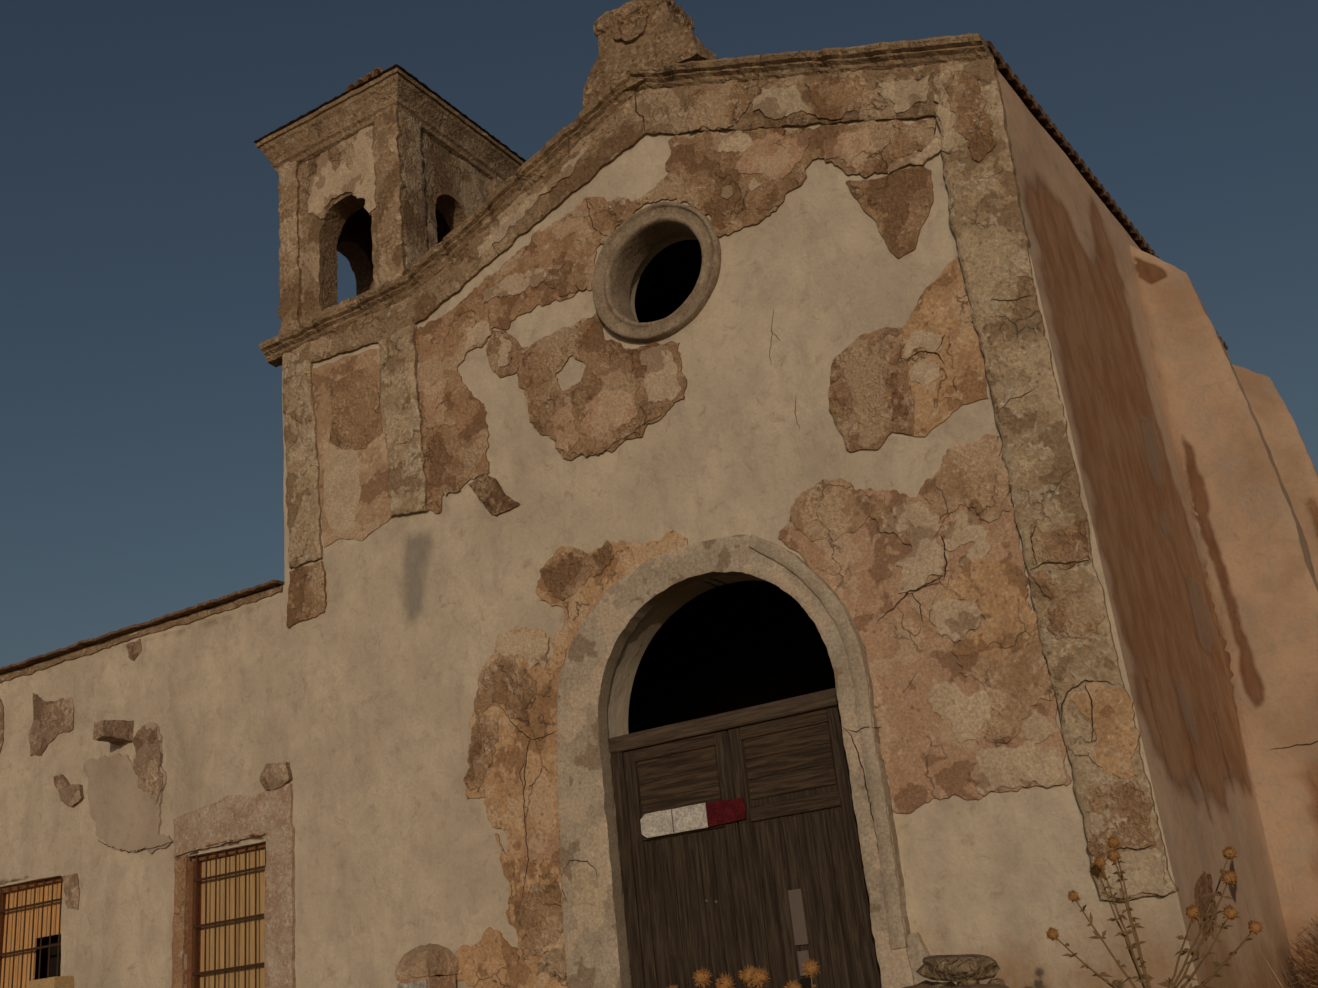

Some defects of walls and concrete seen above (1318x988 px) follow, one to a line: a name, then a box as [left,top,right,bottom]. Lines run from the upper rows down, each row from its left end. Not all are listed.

peeling [53,722,173,854]
peeling [323,367,383,533]
peeling [455,530,688,988]
peeling [415,71,998,516]
peeling [778,434,1173,898]
damp [1026,178,1251,810]
crack [1271,741,1318,750]